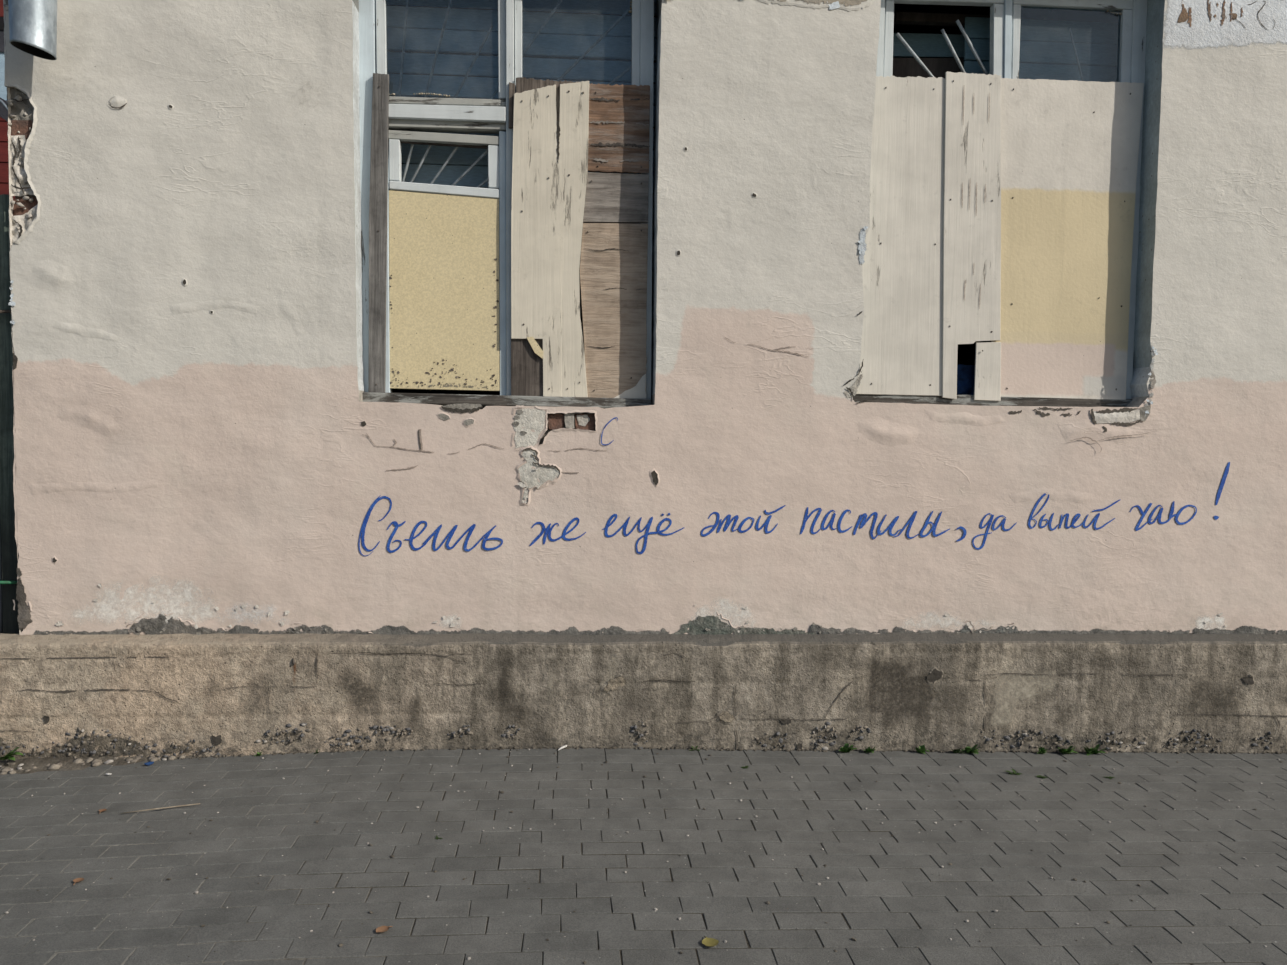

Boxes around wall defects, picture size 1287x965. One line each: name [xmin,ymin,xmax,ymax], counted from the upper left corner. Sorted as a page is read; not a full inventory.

peeling [758,0,874,12]
peeling [1163,0,1287,49]
flaking render [7,84,41,245]
flaking render [511,405,598,506]
spalling [13,568,33,629]
spalling [127,613,231,635]
spalling [274,622,372,635]
crack [0,656,177,702]